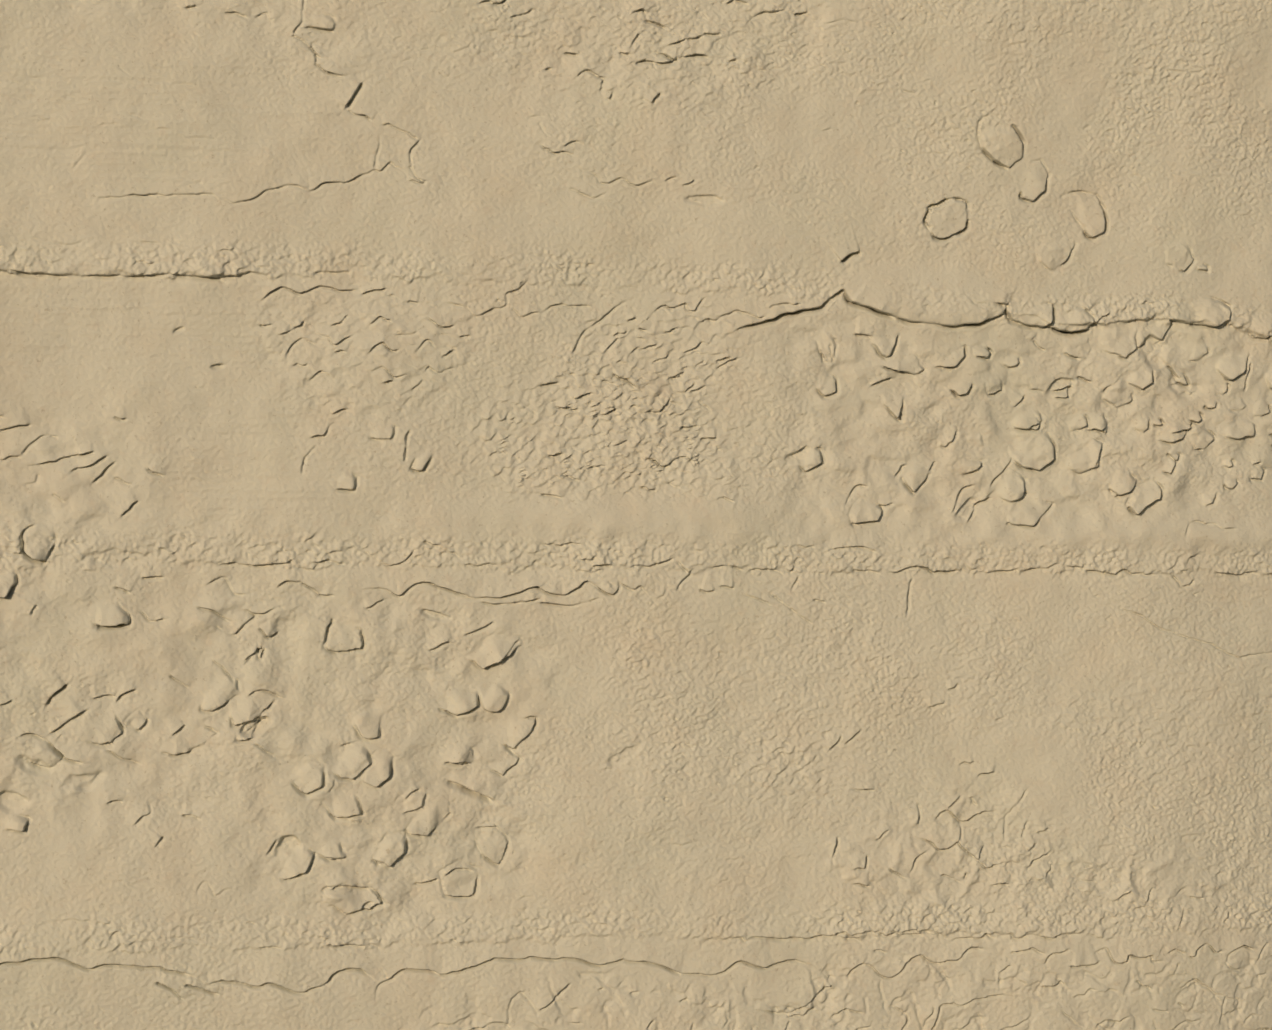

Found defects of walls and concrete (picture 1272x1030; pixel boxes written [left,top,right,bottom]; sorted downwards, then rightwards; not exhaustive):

crack [69,0,429,209]
flaking render [923,197,972,243]
flaking render [977,115,1109,275]
crack [0,265,390,306]
crack [444,249,1090,362]
spalling [251,287,1272,545]
crack [216,517,1272,620]
spalling [0,407,555,928]
crack [0,927,1272,1021]